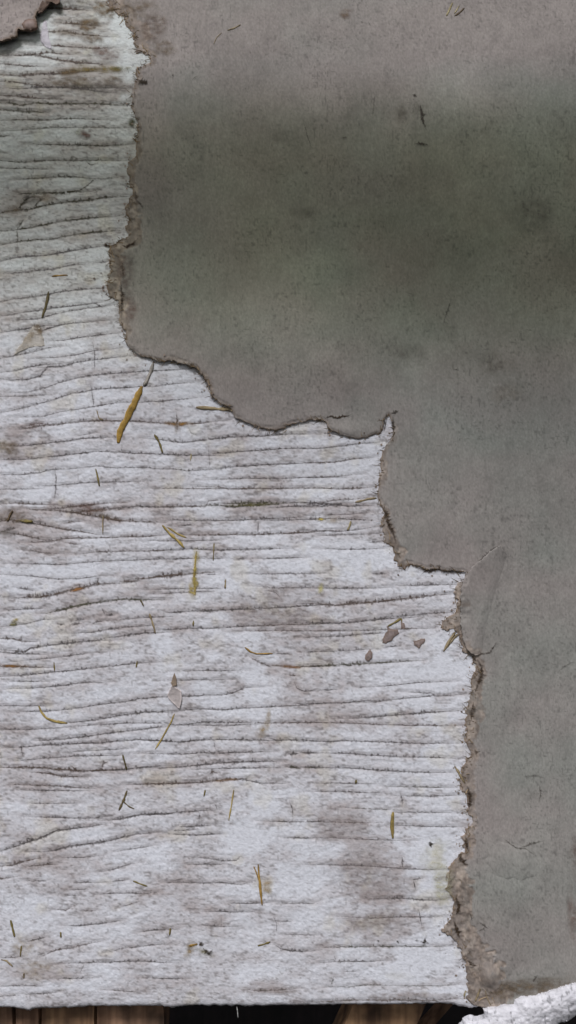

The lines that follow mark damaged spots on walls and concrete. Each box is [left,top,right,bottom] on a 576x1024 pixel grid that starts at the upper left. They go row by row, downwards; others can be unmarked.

peeling [0,0,60,43]
peeling [39,20,52,49]
peeling [382,626,399,644]